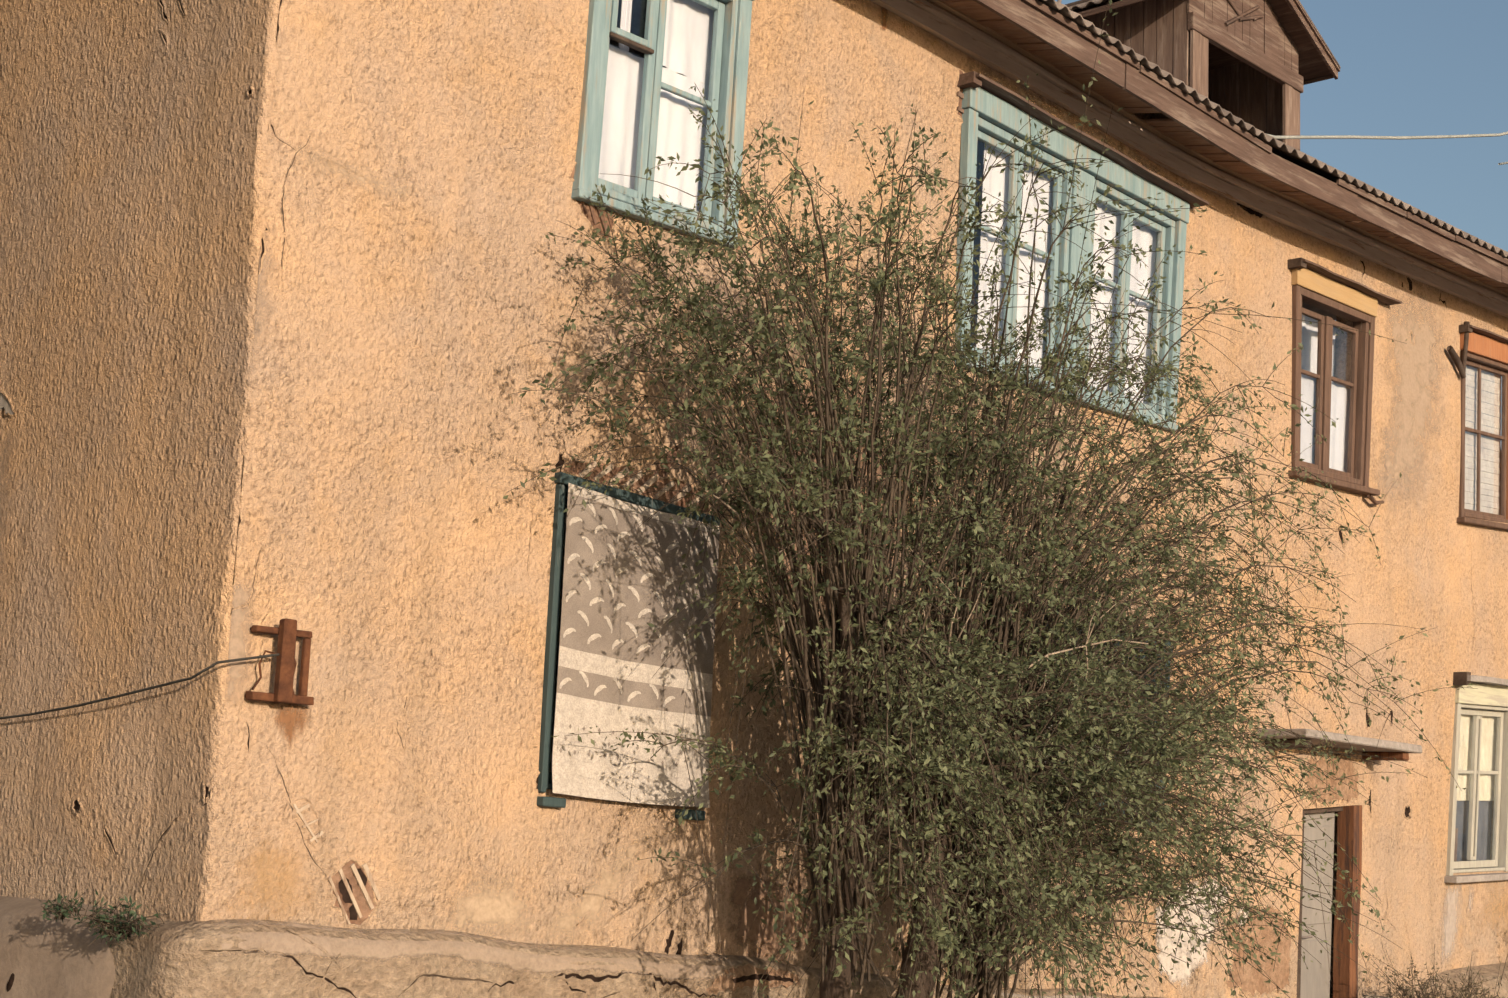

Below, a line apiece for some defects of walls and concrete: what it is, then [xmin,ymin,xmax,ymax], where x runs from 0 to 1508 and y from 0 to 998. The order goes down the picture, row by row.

crack [258,0,365,291]
crack [244,720,328,880]
crack [200,929,360,998]
crack [396,969,717,998]